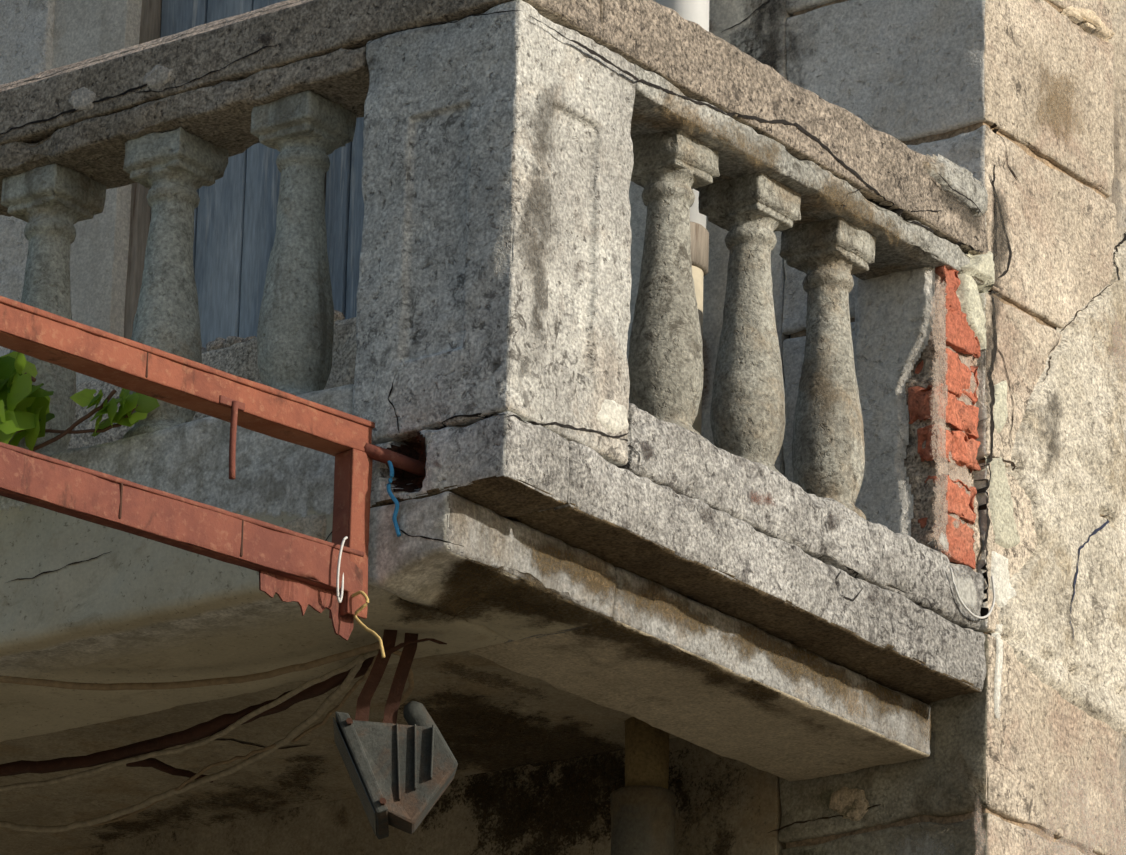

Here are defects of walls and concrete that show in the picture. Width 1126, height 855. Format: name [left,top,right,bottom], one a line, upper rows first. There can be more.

crack [0,42,283,134]
leakage [731,0,813,70]
crack [362,10,1019,620]
crack [1044,232,1126,380]
flaking render [908,265,1020,609]
crack [6,552,110,583]
leakage [397,538,931,736]
crack [1070,514,1110,639]
leakage [398,662,625,855]
crack [768,804,881,833]